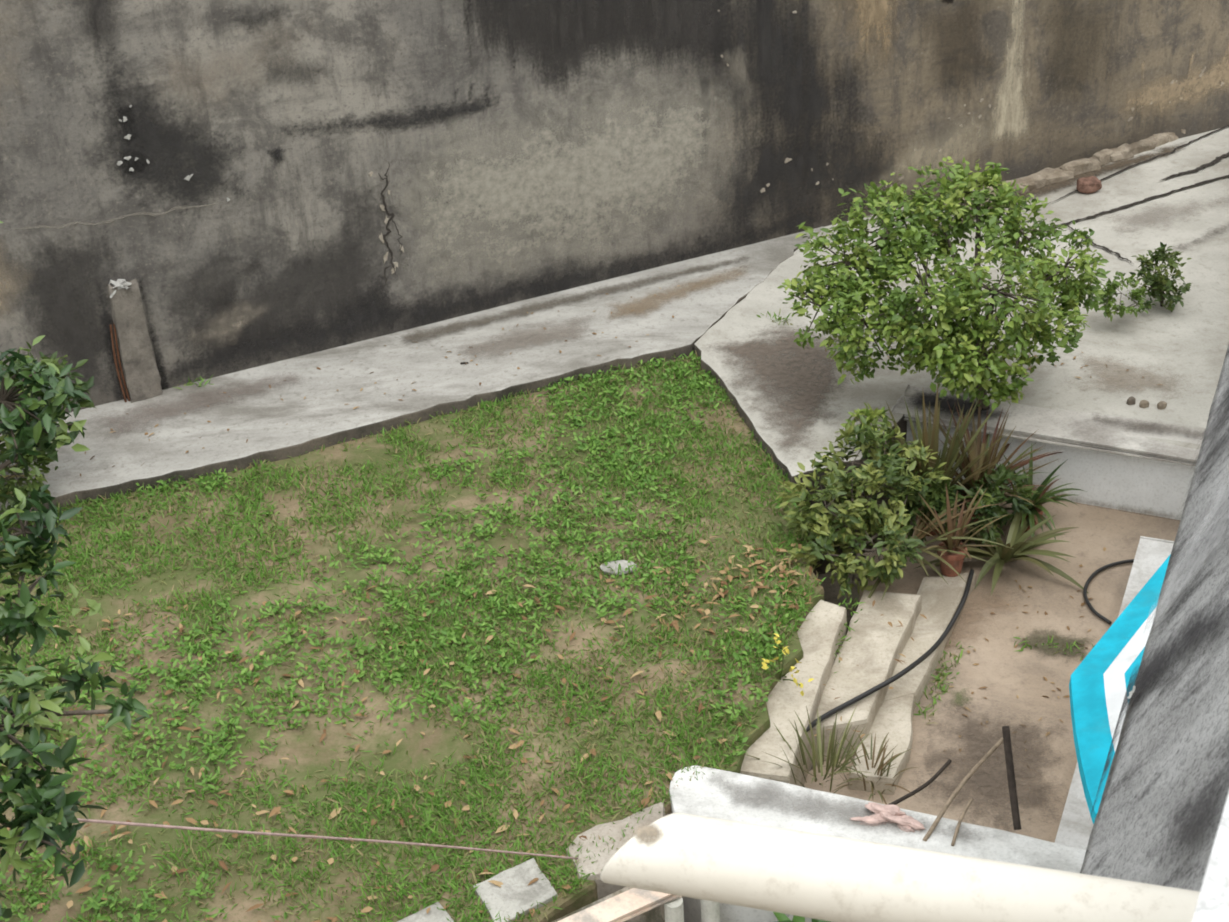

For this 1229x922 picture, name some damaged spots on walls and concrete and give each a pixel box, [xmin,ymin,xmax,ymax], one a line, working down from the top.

spalling [117,105,150,172]
crack [368,159,404,284]
damp [171,0,1028,378]
crack [1050,125,1229,263]
corrosion [110,324,130,402]